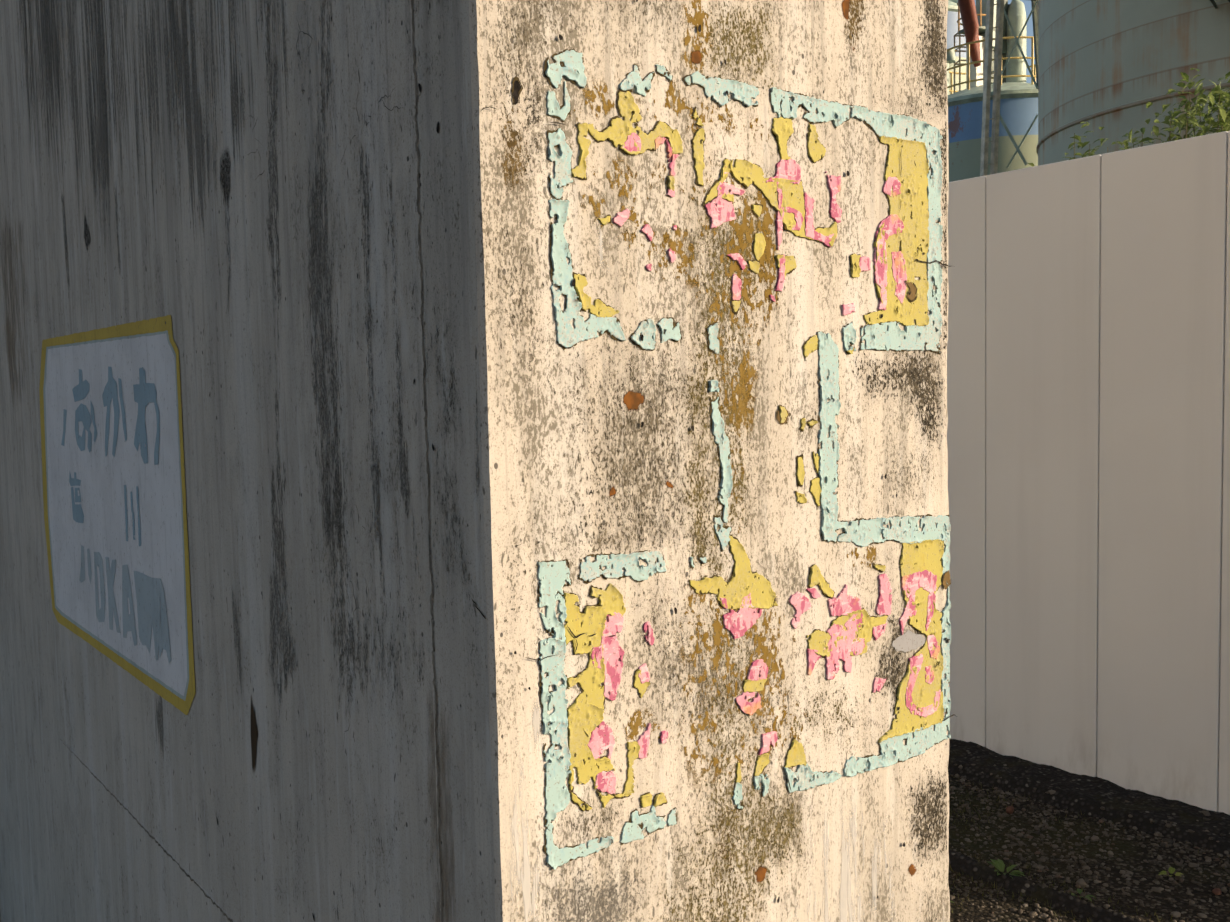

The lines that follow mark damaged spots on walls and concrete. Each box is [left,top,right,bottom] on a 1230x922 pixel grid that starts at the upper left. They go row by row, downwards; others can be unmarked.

rust [683,0,713,72]
damp [844,0,867,52]
peeling [544,34,951,810]
peeling [528,550,677,870]